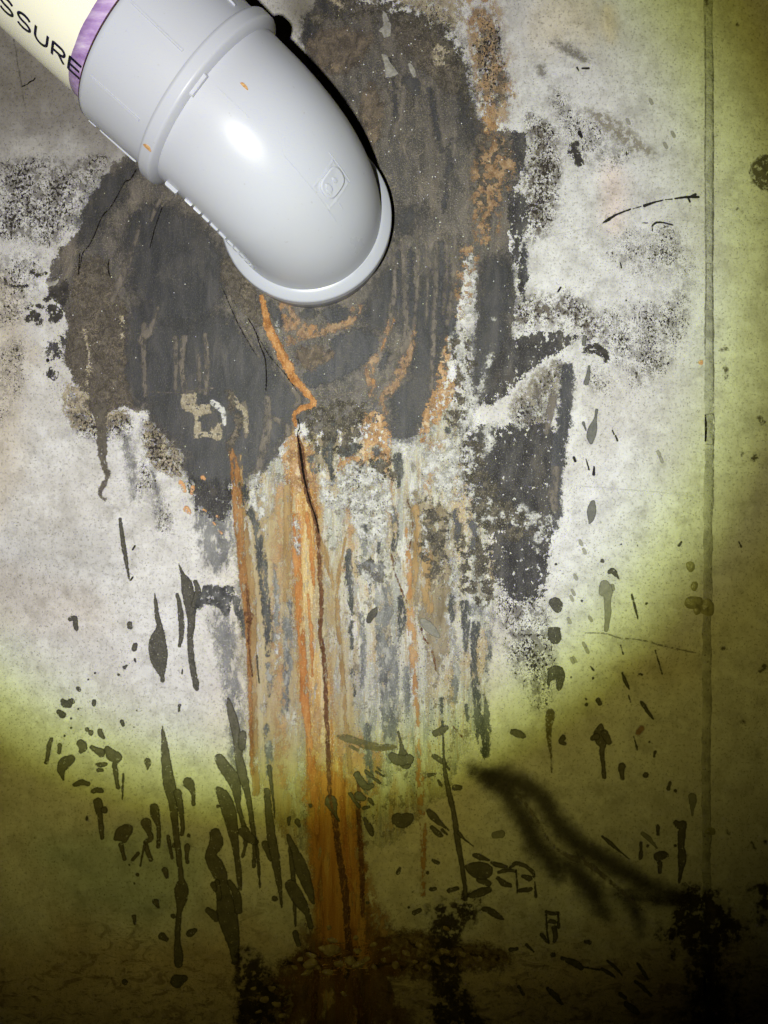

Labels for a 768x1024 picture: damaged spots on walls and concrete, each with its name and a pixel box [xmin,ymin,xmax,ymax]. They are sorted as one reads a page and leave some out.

leakage [549,93,631,169]
leakage [606,225,694,279]
corrosion [420,336,461,453]
leakage [609,295,689,380]
leakage [0,0,607,1024]
crack [297,419,335,812]
corrosion [259,295,417,1024]
corrosion [405,504,434,896]
leakage [599,559,619,632]
leakage [621,672,654,720]
leakage [540,910,653,997]
leakage [601,781,768,1024]